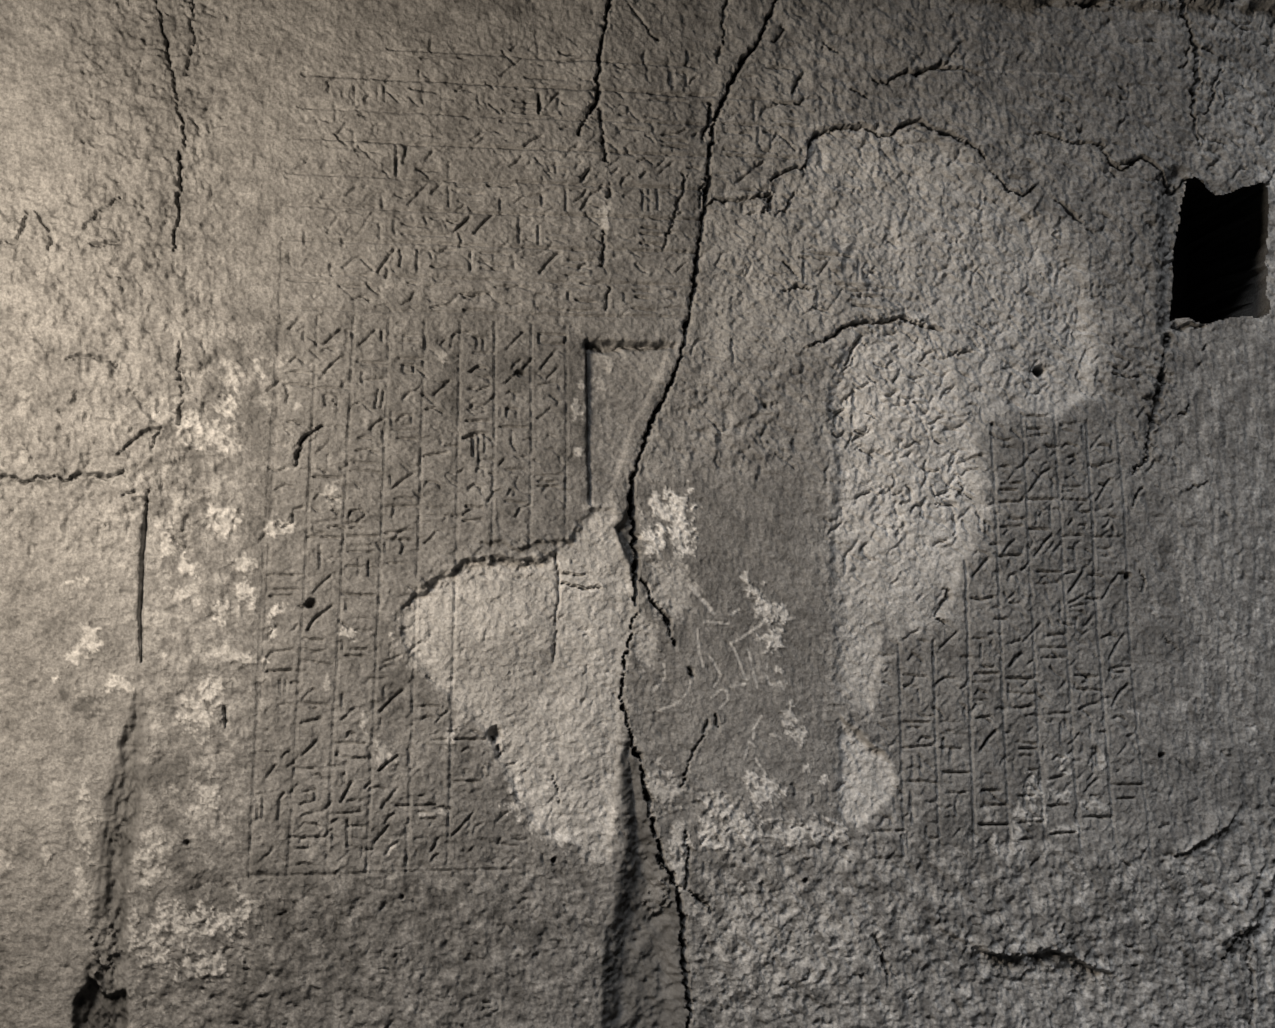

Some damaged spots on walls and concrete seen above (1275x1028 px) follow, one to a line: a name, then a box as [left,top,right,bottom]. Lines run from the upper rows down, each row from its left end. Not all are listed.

crack [1072,0,1128,9]
crack [1171,0,1225,147]
crack [1031,131,1189,197]
crack [1112,320,1210,508]
crack [550,0,1085,1028]